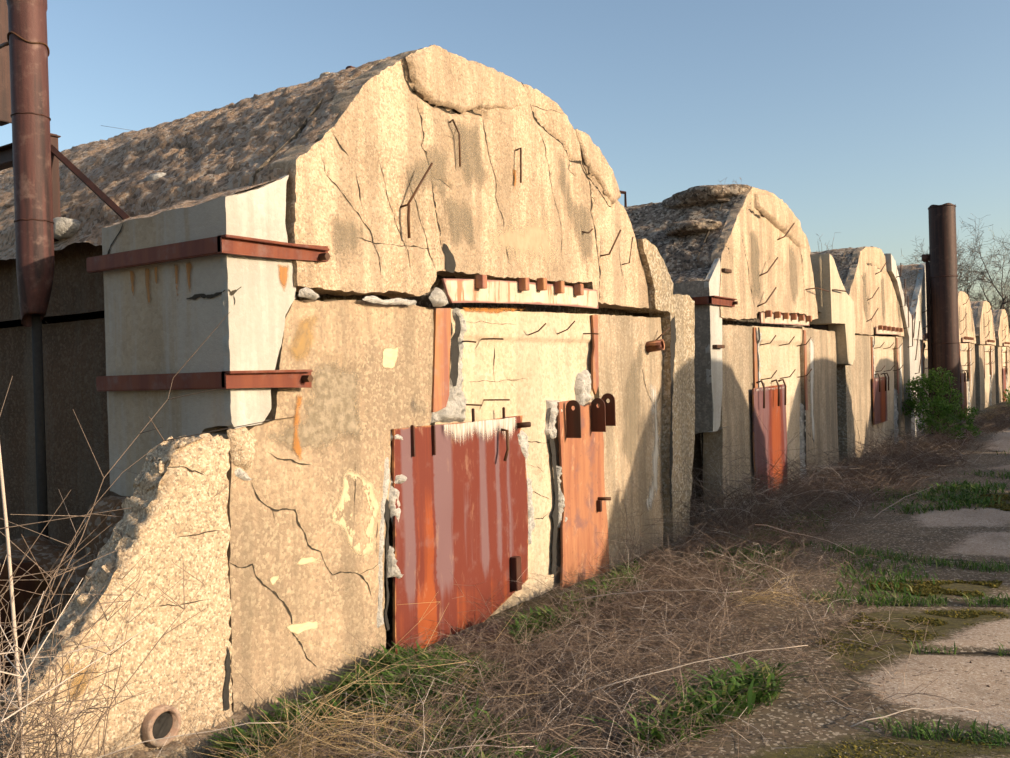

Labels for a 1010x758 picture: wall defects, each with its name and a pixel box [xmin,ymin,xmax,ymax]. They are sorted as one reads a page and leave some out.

crack [322,60,510,272]
crack [521,82,627,299]
crack [187,287,241,305]
spalling [363,296,417,306]
corrosion [293,397,302,458]
spalling [429,287,535,545]
spalling [544,400,562,440]
spalling [574,369,592,406]
crack [251,482,390,631]
peeling [331,457,407,628]
spalling [553,466,568,528]
crack [229,562,317,667]